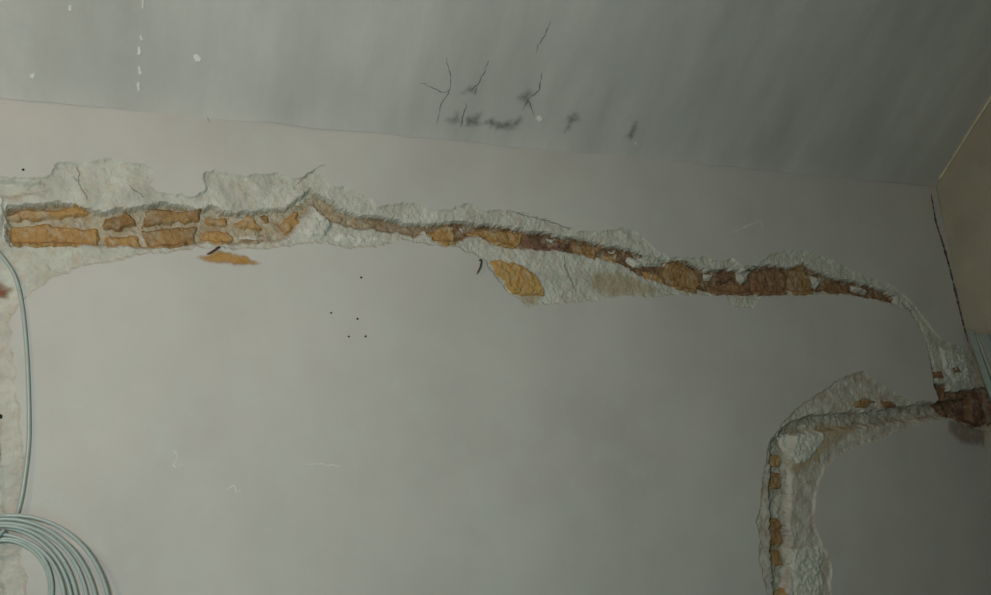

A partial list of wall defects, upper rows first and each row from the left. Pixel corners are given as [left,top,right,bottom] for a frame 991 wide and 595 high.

crack [423,58,489,127]
crack [523,23,550,115]
flaking render [0,158,991,595]